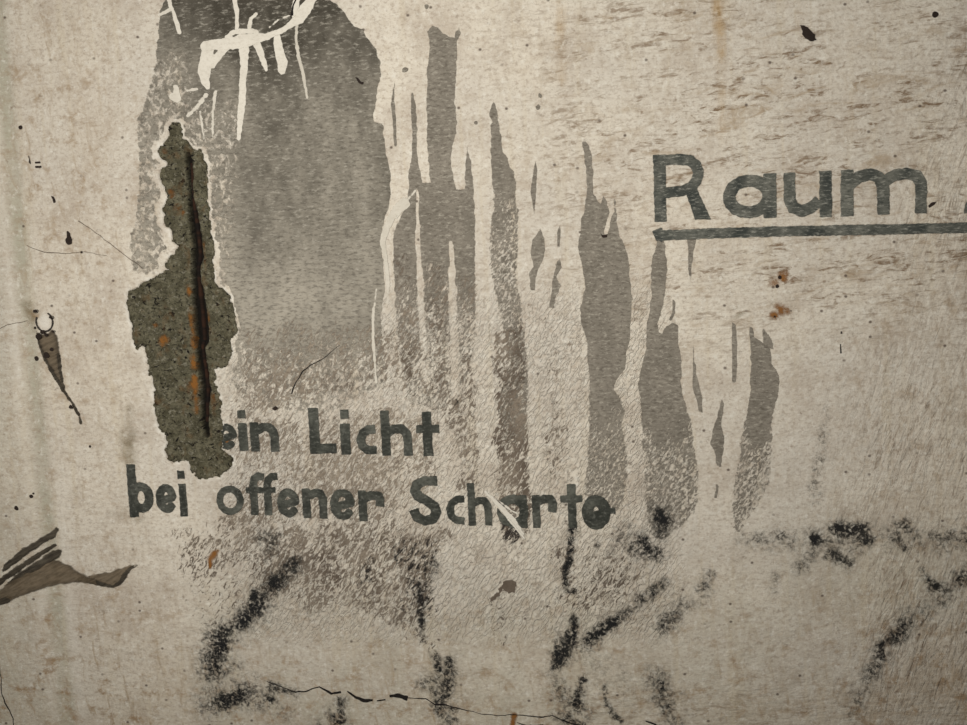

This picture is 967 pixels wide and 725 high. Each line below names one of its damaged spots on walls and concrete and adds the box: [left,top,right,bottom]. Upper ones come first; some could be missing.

corrosion [770,305,791,318]
spalling [126,122,480,651]
peeling [541,318,574,481]
peeling [491,326,532,554]
peeling [490,580,517,644]
peeling [549,546,650,614]
crack [267,681,580,725]